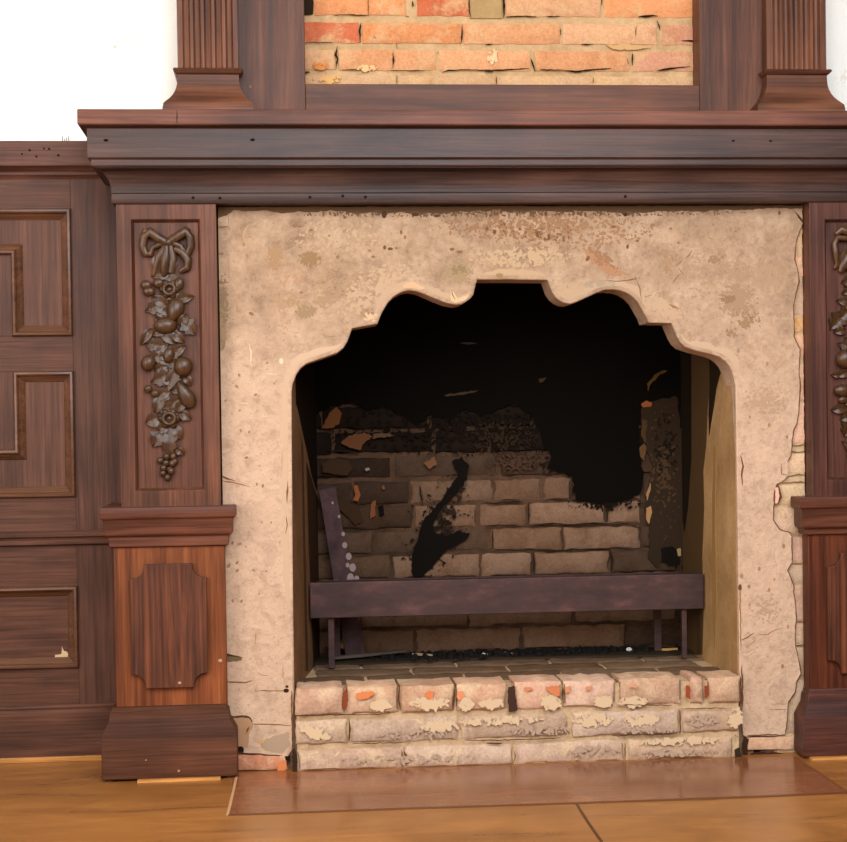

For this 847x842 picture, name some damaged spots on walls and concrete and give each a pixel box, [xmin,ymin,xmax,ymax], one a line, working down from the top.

flaking render [786,227,805,443]
spalling [341,433,393,450]
spalling [639,419,647,460]
flaking render [788,453,805,473]
peeling [342,532,359,580]
flaking render [746,484,805,753]
spalling [343,689,375,710]
spalling [546,686,571,696]
flaking render [233,718,288,771]